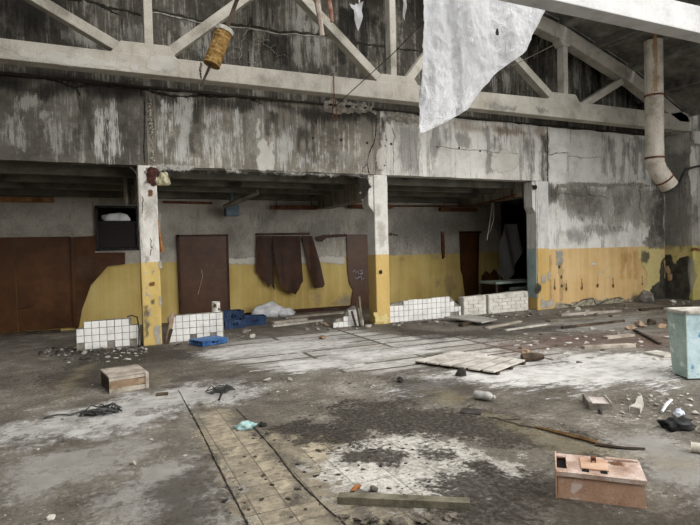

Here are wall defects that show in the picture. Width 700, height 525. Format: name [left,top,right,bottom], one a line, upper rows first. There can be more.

leakage [1,79,143,164]
leakage [156,93,385,177]
crack [362,121,395,177]
crack [546,128,609,205]
peeling [534,236,675,309]
peeling [144,288,162,345]